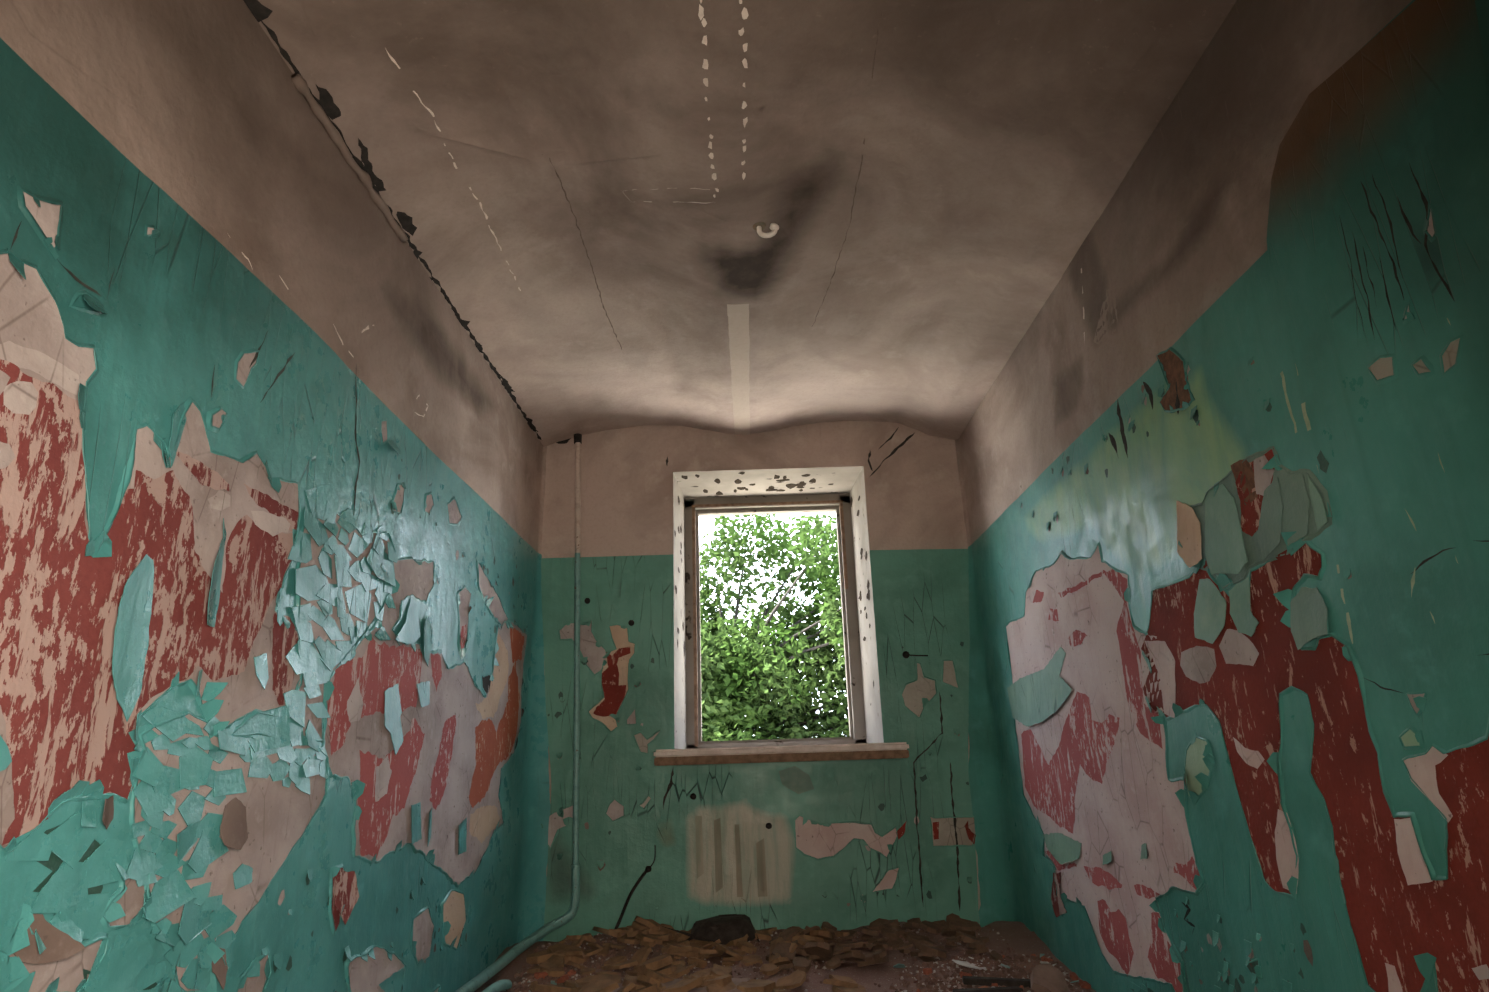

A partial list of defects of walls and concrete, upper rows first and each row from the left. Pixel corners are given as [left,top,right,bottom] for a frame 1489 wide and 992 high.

flaking render [291,73,423,259]
peeling [0,185,527,992]
peeling [558,620,662,771]
peeling [901,662,937,718]
peeling [1006,446,1489,992]
peeling [793,815,906,902]